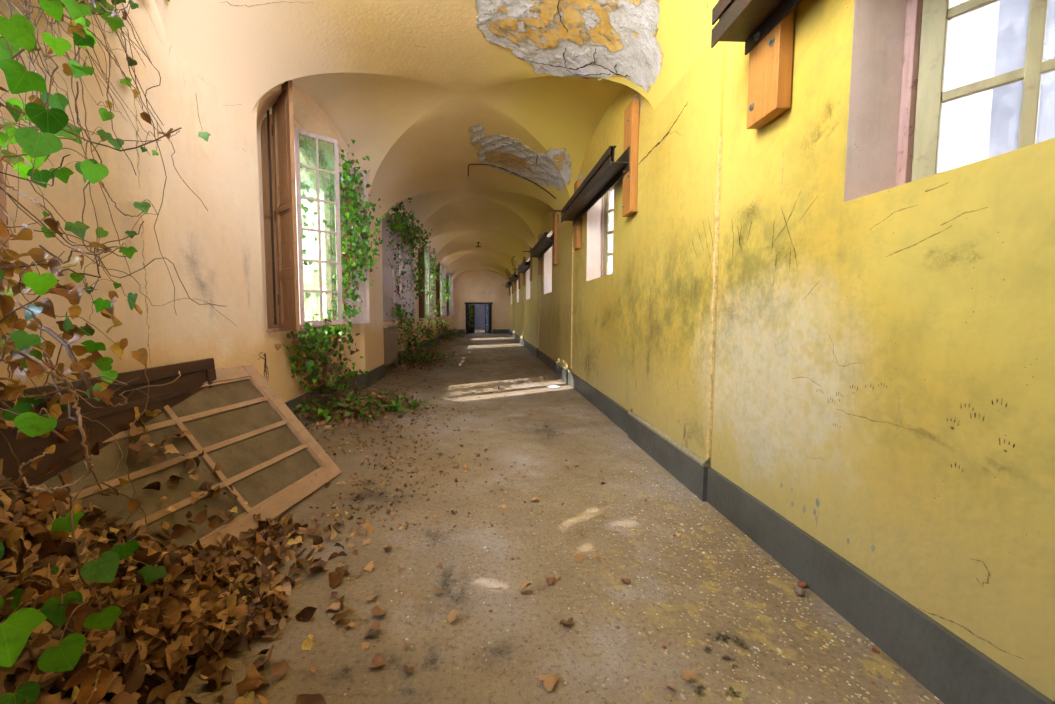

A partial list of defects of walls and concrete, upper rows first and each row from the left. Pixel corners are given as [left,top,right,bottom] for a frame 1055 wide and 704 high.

peeling [474,0,664,111]
peeling [468,123,583,190]
crack [639,102,688,164]